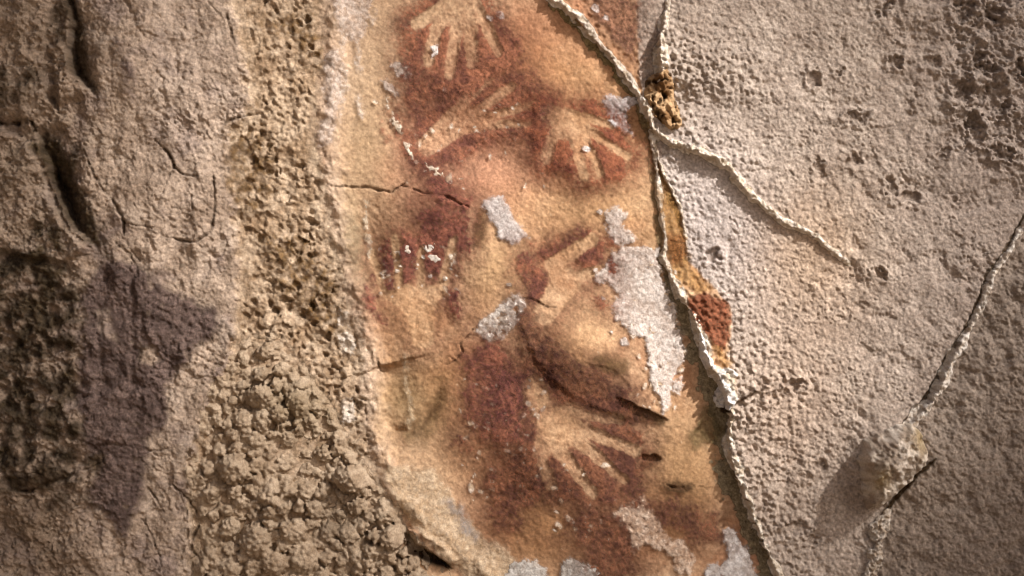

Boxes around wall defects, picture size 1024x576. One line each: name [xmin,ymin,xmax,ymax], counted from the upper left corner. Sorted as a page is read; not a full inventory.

spalling [482,195,527,245]
spalling [476,283,526,341]
spalling [593,206,685,415]
crack [546,0,851,576]
crack [902,215,1024,427]
spalling [612,495,758,576]
crack [863,509,892,576]